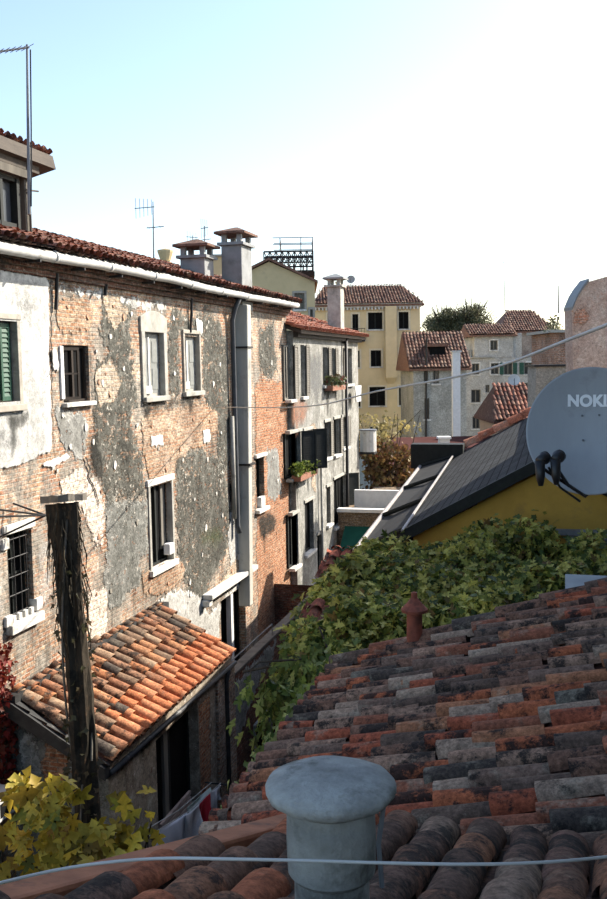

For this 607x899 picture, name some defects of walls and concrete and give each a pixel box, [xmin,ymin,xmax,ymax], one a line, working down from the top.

peeling [52,283,239,639]
flaking render [235,322,292,744]